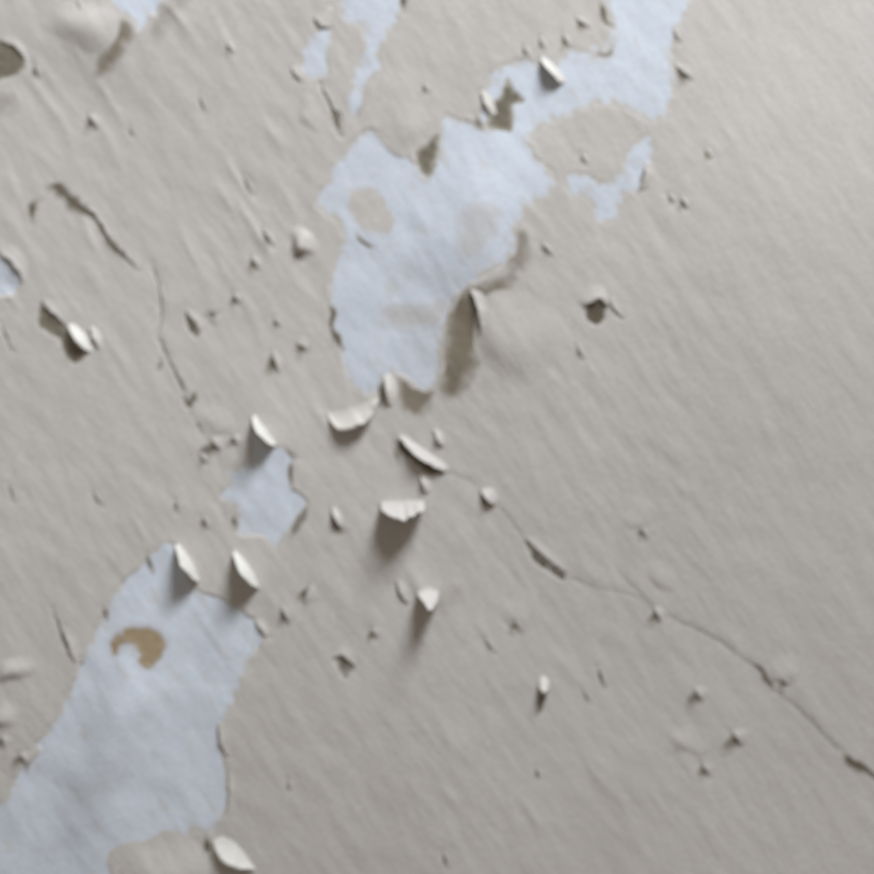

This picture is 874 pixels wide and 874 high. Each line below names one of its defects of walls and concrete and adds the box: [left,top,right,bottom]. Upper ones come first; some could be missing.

peeling [104,0,162,30]
peeling [291,0,408,119]
peeling [0,244,28,295]
crack [27,181,203,434]
peeling [316,0,693,431]
peeling [197,415,307,550]
corrosion [104,617,174,674]
peeling [0,541,318,874]
crack [566,569,874,779]